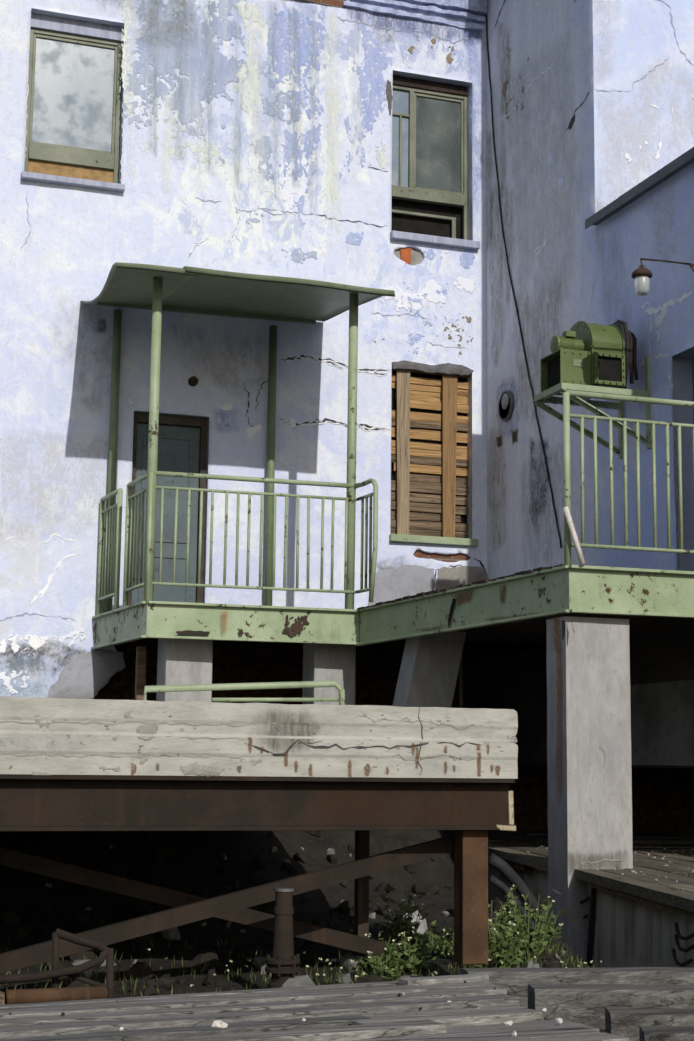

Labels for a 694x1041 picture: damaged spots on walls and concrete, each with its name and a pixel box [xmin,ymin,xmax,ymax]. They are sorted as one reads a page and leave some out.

crack [565,0,693,131]
peeling [119,0,393,224]
crack [187,197,387,259]
peeling [380,247,477,357]
crack [242,354,389,427]
crack [280,418,391,432]
peeling [0,623,96,655]
corrosion [280,610,311,637]
peeling [0,670,29,695]
corrosion [548,614,564,790]
crack [0,709,489,777]
corrosion [477,745,500,776]